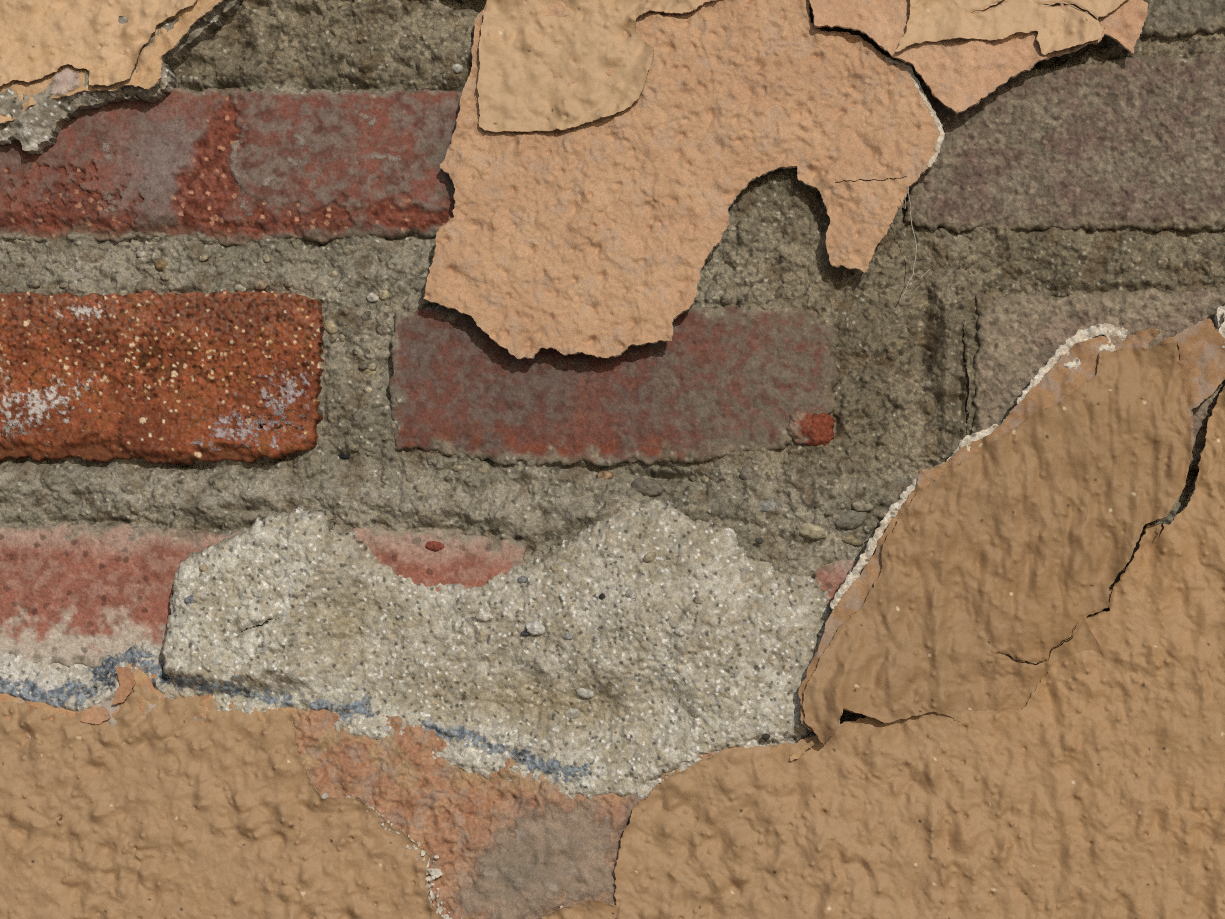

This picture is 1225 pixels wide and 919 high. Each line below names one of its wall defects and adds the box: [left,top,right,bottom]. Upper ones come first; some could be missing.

peeling [50,68,81,95]
peeling [423,0,1148,359]
leakage [44,303,106,320]
leakage [0,354,96,442]
leakage [191,361,310,450]
crack [998,521,1164,665]
flaking render [0,499,832,919]